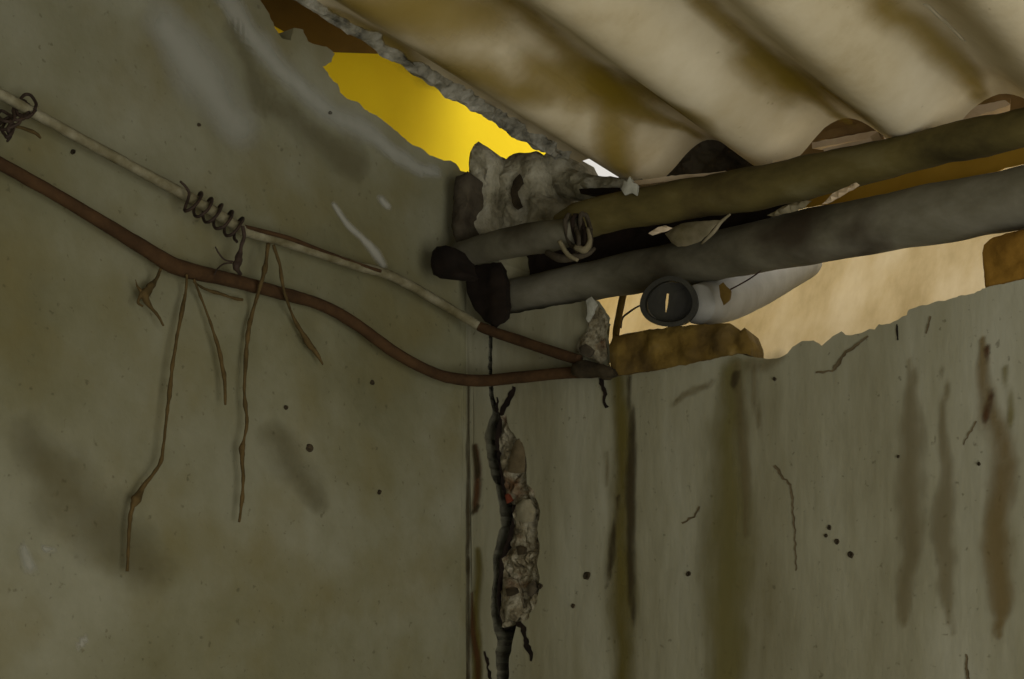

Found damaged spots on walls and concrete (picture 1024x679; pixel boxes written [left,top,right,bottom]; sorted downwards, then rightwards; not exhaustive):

crack [816,336,869,374]
crack [484,325,533,679]
spalling [499,415,543,628]
crack [773,465,797,571]
rust [980,338,1013,630]